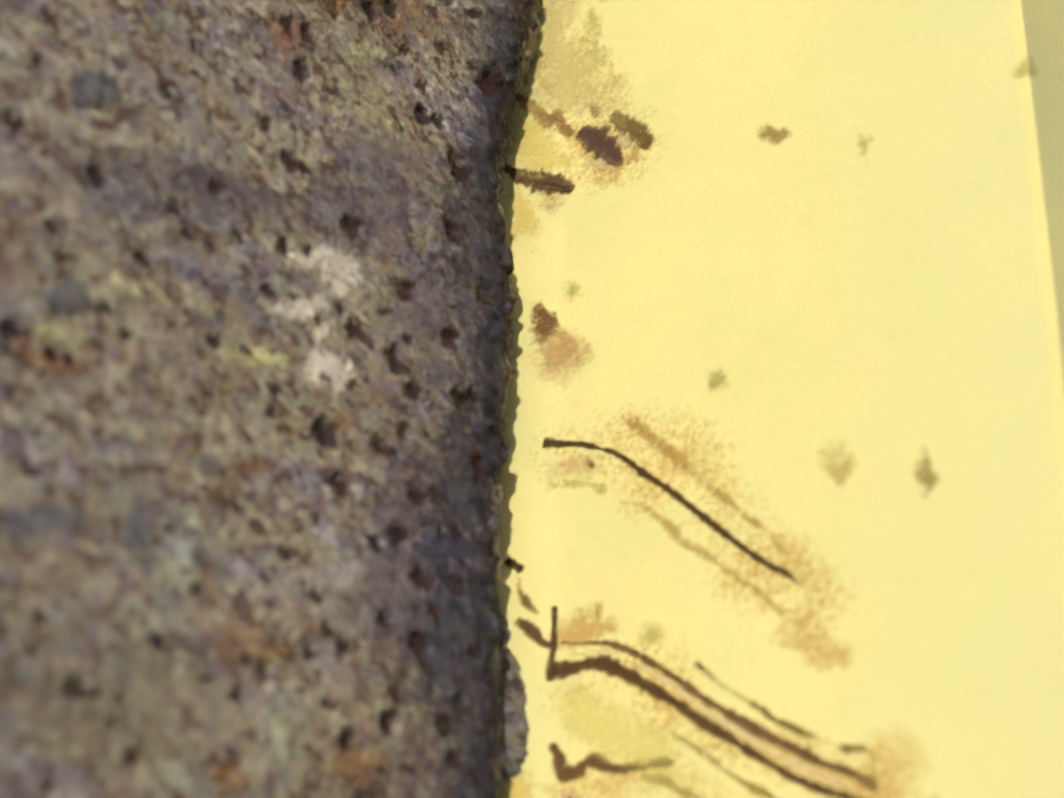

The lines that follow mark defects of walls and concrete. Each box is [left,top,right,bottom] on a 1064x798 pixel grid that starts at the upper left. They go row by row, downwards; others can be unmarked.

leakage [232,236,366,400]
rust [532,303,587,370]
rust [556,615,615,644]